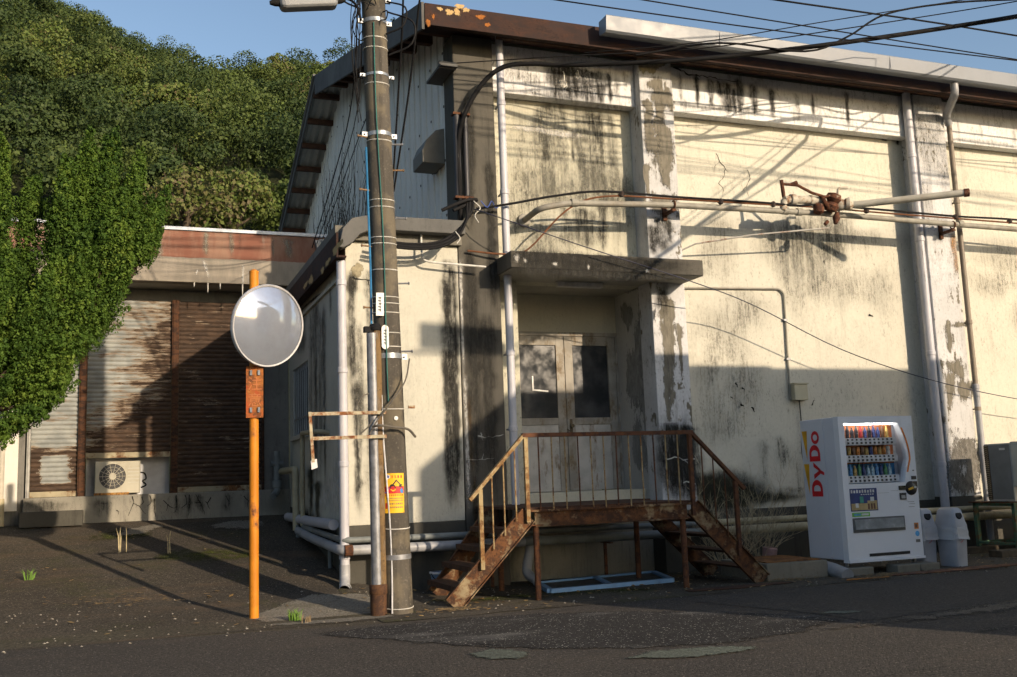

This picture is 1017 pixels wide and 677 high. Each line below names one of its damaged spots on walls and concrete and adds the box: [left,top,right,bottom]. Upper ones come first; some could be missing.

damp [464,97,498,303]
damp [515,67,678,281]
peeling [636,58,678,219]
damp [679,74,757,113]
damp [768,222,852,291]
damp [298,278,336,467]
damp [348,274,363,501]
damp [442,252,499,490]
peeling [620,287,648,475]
peeling [652,280,683,422]
peeling [939,320,973,411]
peeling [947,428,981,497]